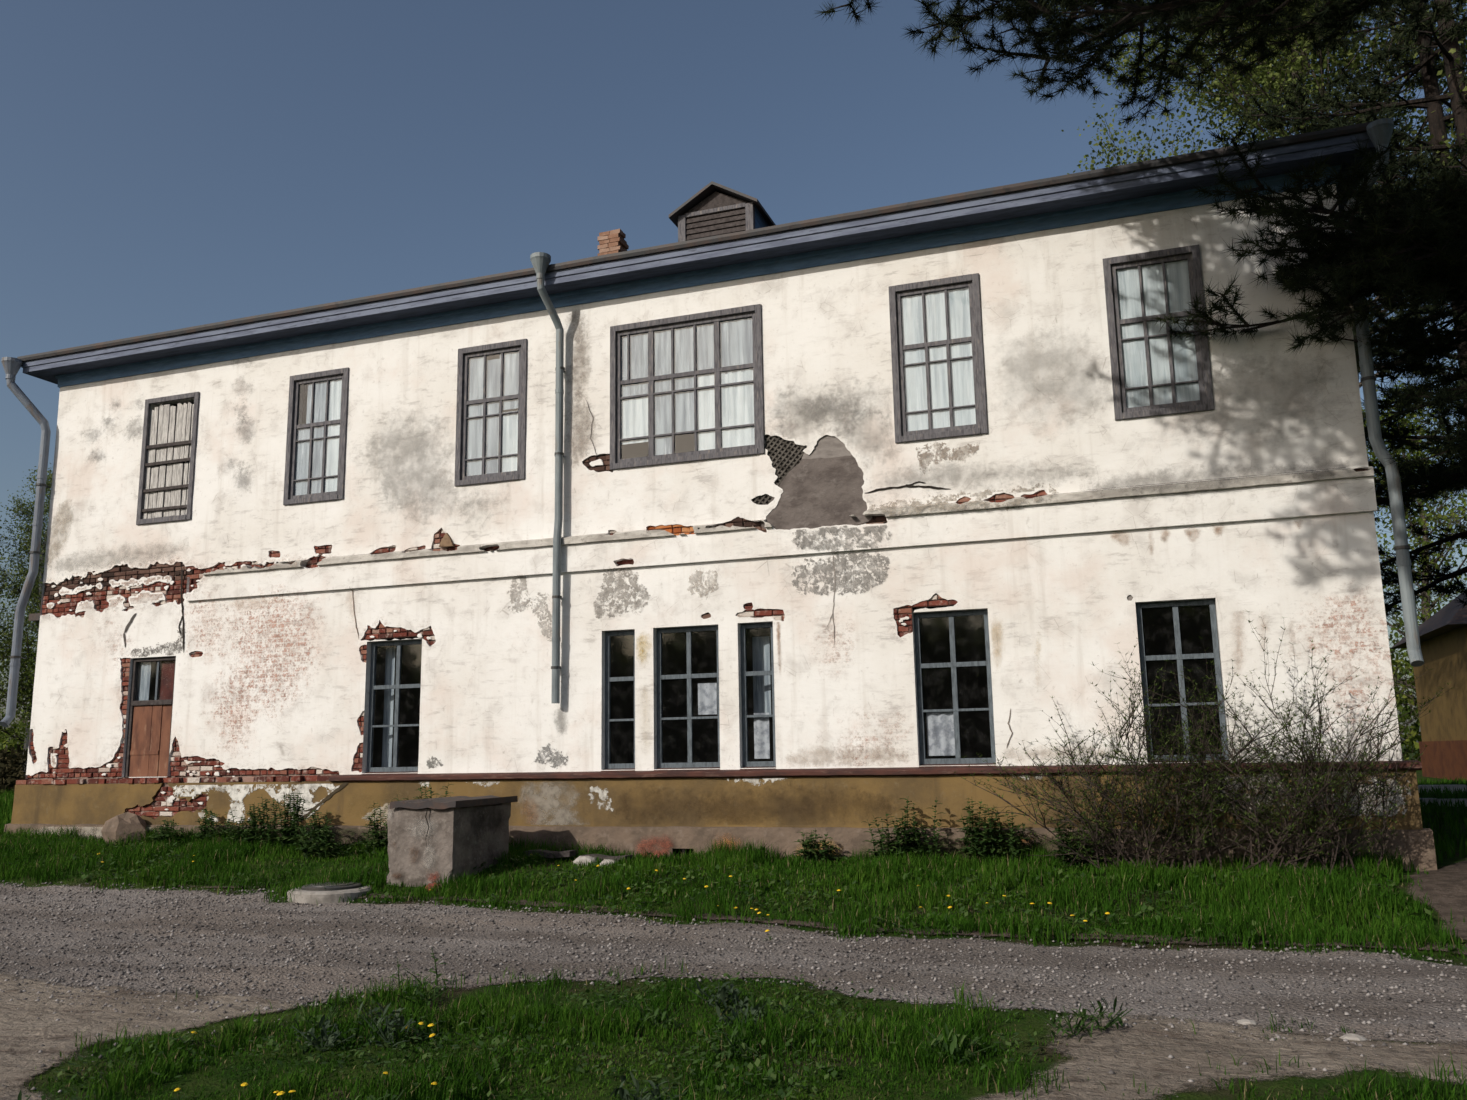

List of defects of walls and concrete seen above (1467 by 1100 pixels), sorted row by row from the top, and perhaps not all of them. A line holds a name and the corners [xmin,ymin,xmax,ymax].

spalling [583,454,613,472]
flaking render [647,435,1056,595]
spalling [42,545,338,618]
spalling [360,621,436,663]
peeling [594,559,650,619]
spalling [893,593,957,637]
spalling [27,628,203,780]
spalling [125,712,364,823]